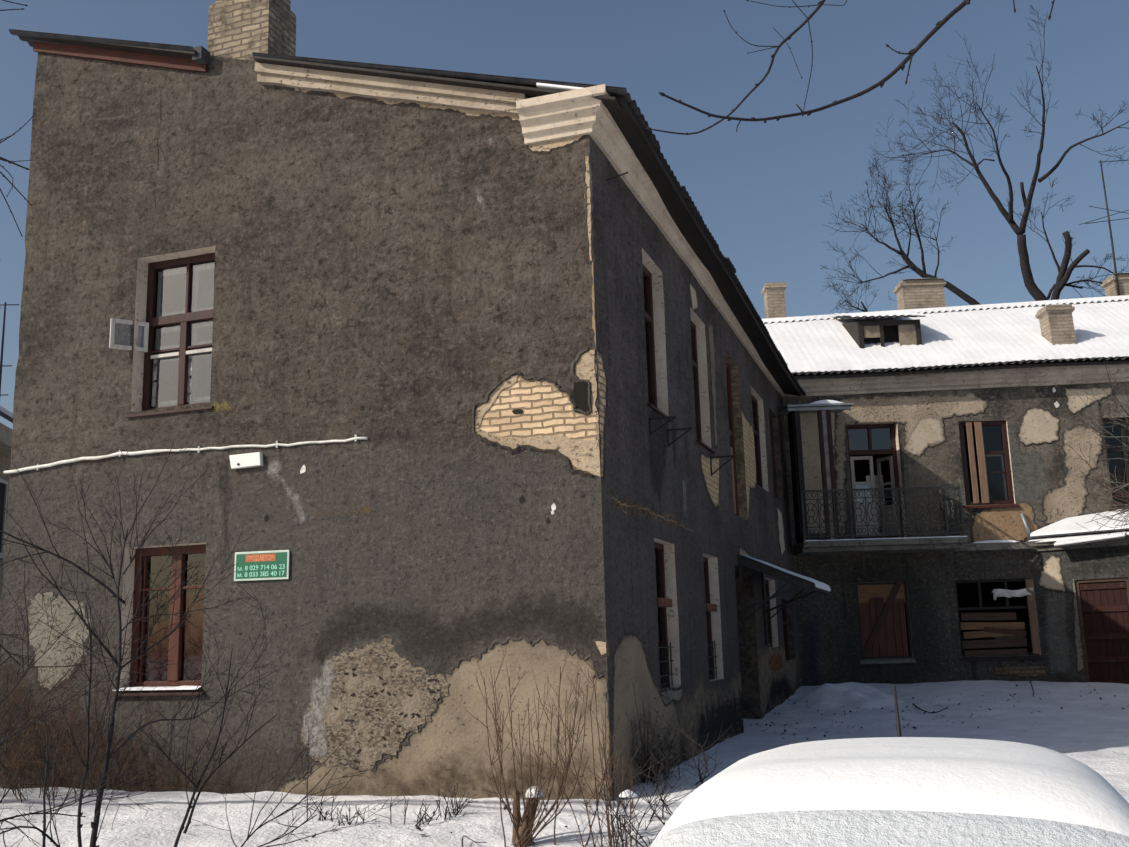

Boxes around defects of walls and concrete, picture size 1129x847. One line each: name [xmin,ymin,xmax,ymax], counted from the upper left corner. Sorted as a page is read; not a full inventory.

flaking render [471,347,608,479]
flaking render [800,393,989,535]
flaking render [970,387,1113,543]
peeling [24,587,94,695]
water stain [302,600,597,757]
flaking render [278,632,684,801]
flaking render [1038,555,1085,673]